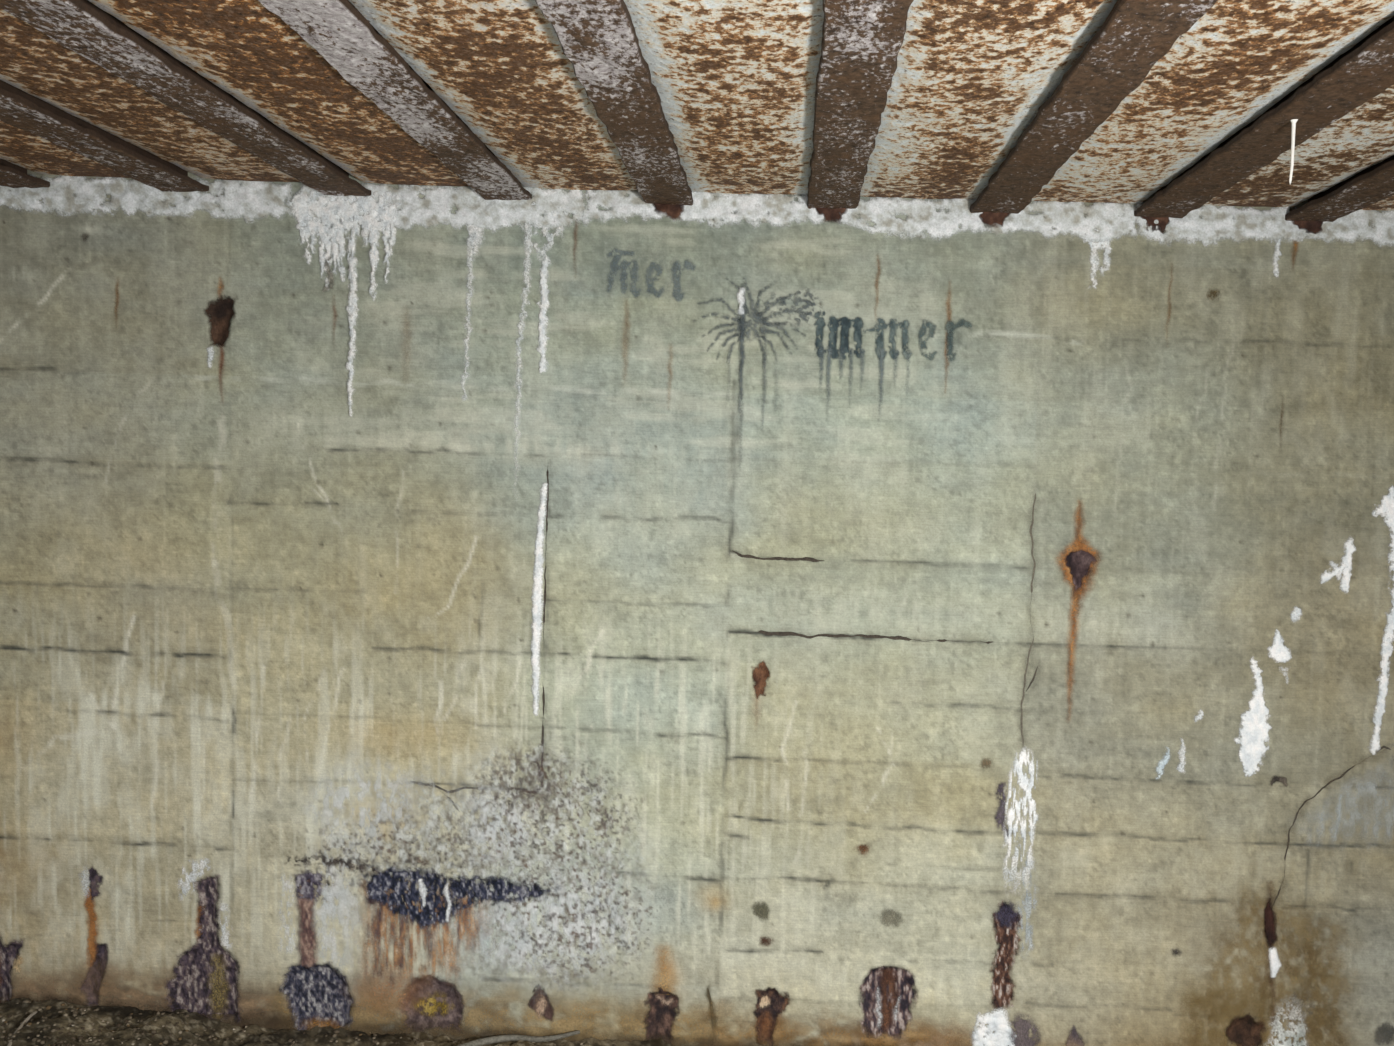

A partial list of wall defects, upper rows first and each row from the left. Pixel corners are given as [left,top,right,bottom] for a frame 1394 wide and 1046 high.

corrosion [653,203,684,219]
water stain [0,175,1394,425]
corrosion [815,207,847,222]
corrosion [979,212,1011,226]
corrosion [1141,217,1170,233]
water stain [531,483,547,715]
water stain [1370,486,1394,755]
water stain [1235,629,1292,776]
spalling [166,859,240,1022]
spalling [279,750,640,1032]
spalling [859,966,917,1038]
crack [1272,745,1394,907]